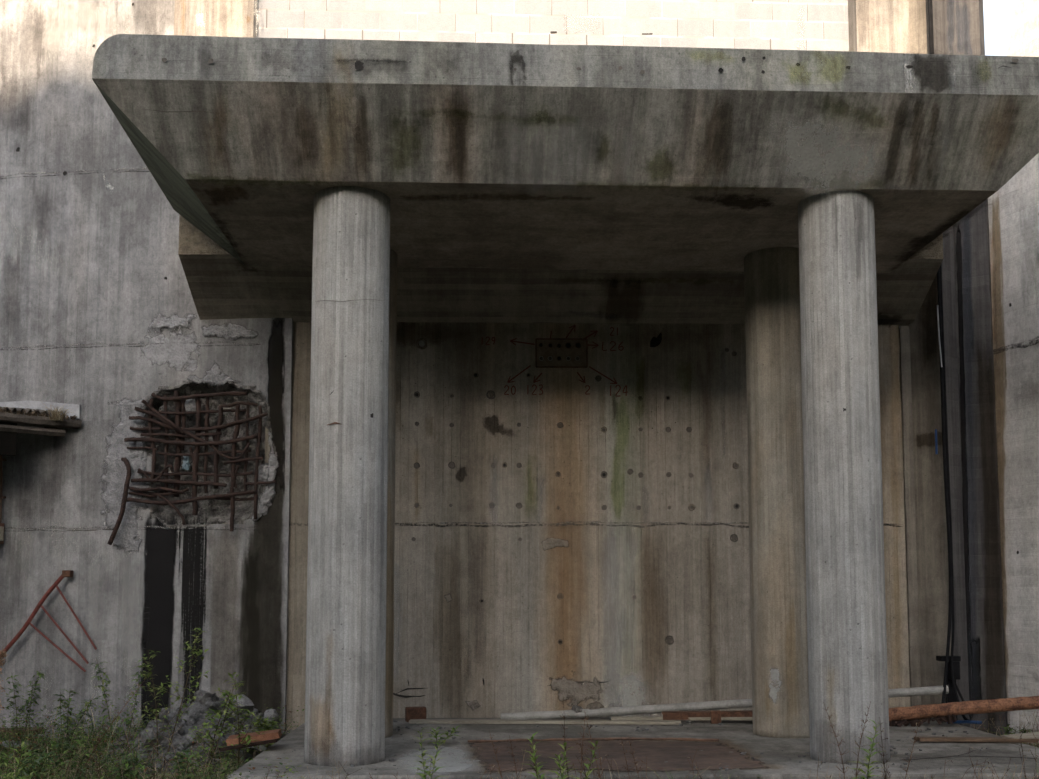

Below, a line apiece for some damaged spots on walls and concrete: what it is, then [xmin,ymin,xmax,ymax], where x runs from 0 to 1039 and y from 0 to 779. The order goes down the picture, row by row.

spalling [100,314,279,554]
damp [141,513,207,726]